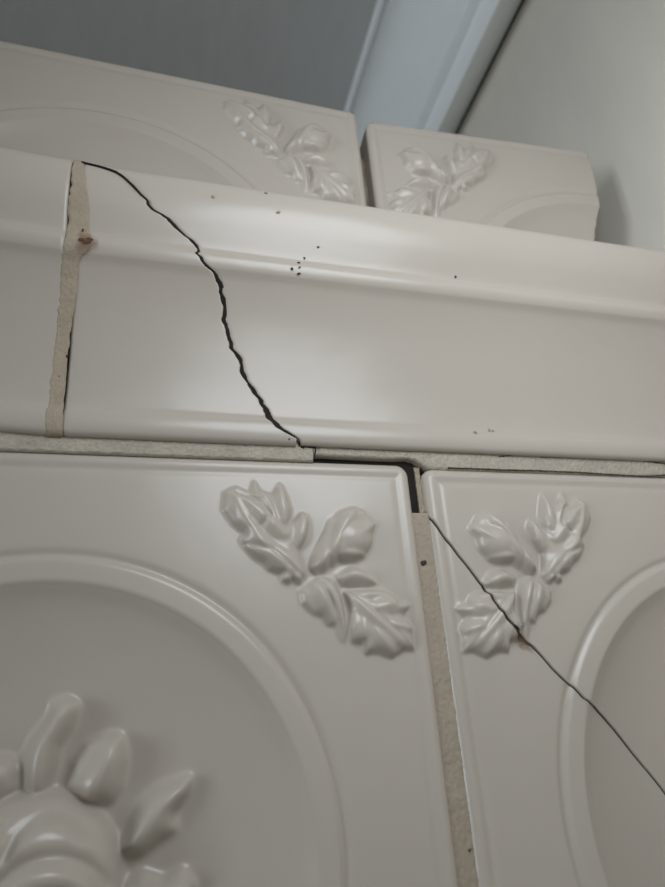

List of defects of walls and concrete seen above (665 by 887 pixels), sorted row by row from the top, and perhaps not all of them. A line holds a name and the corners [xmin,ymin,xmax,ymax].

crack [81,161,316,461]
crack [429,518,665,795]